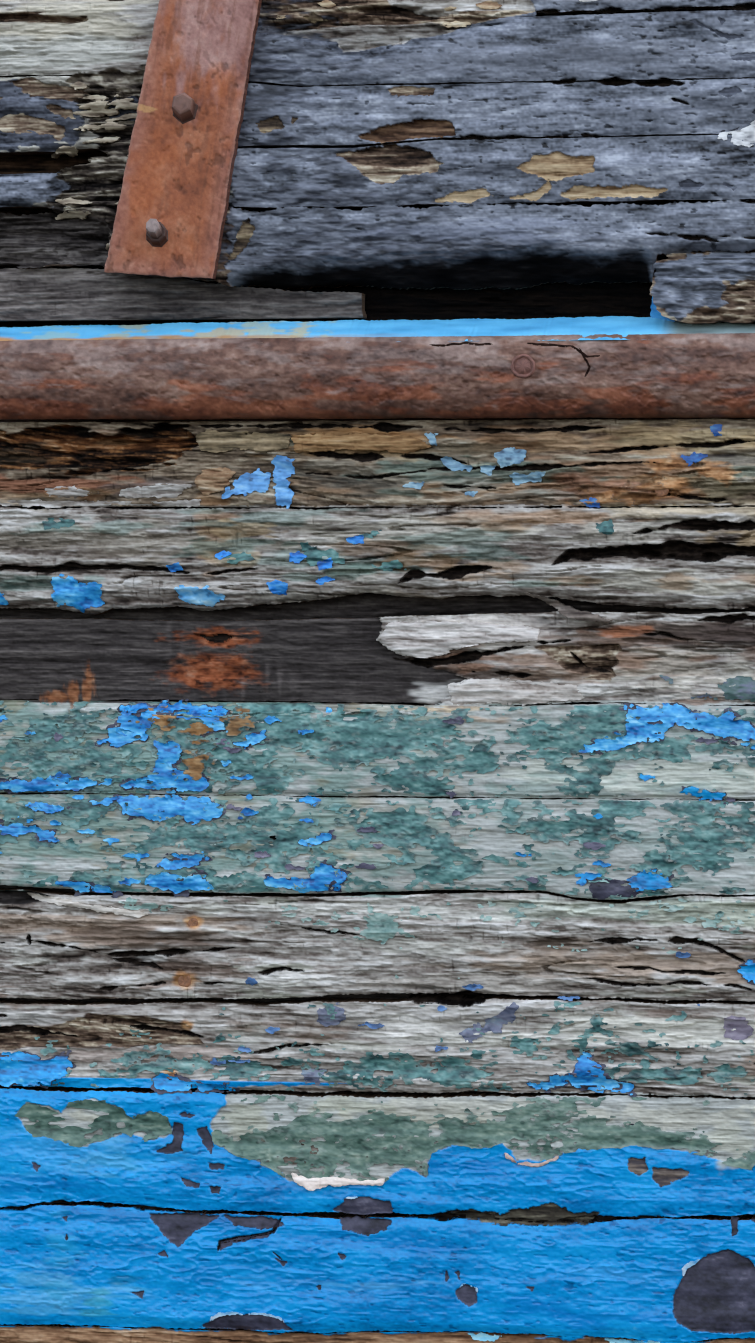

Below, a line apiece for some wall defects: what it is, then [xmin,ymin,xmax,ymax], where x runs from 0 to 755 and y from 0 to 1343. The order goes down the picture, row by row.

peeling [510,151,705,201]
peeling [221,455,295,509]
crack [553,493,755,565]
peeling [51,574,105,613]
rust [38,657,98,714]
rust [135,623,274,781]
peeling [0,676,755,952]
crack [589,937,752,991]
peeling [0,996,755,1236]
crack [1,1200,172,1211]
peeling [150,1212,284,1257]
peeling [673,1216,755,1334]